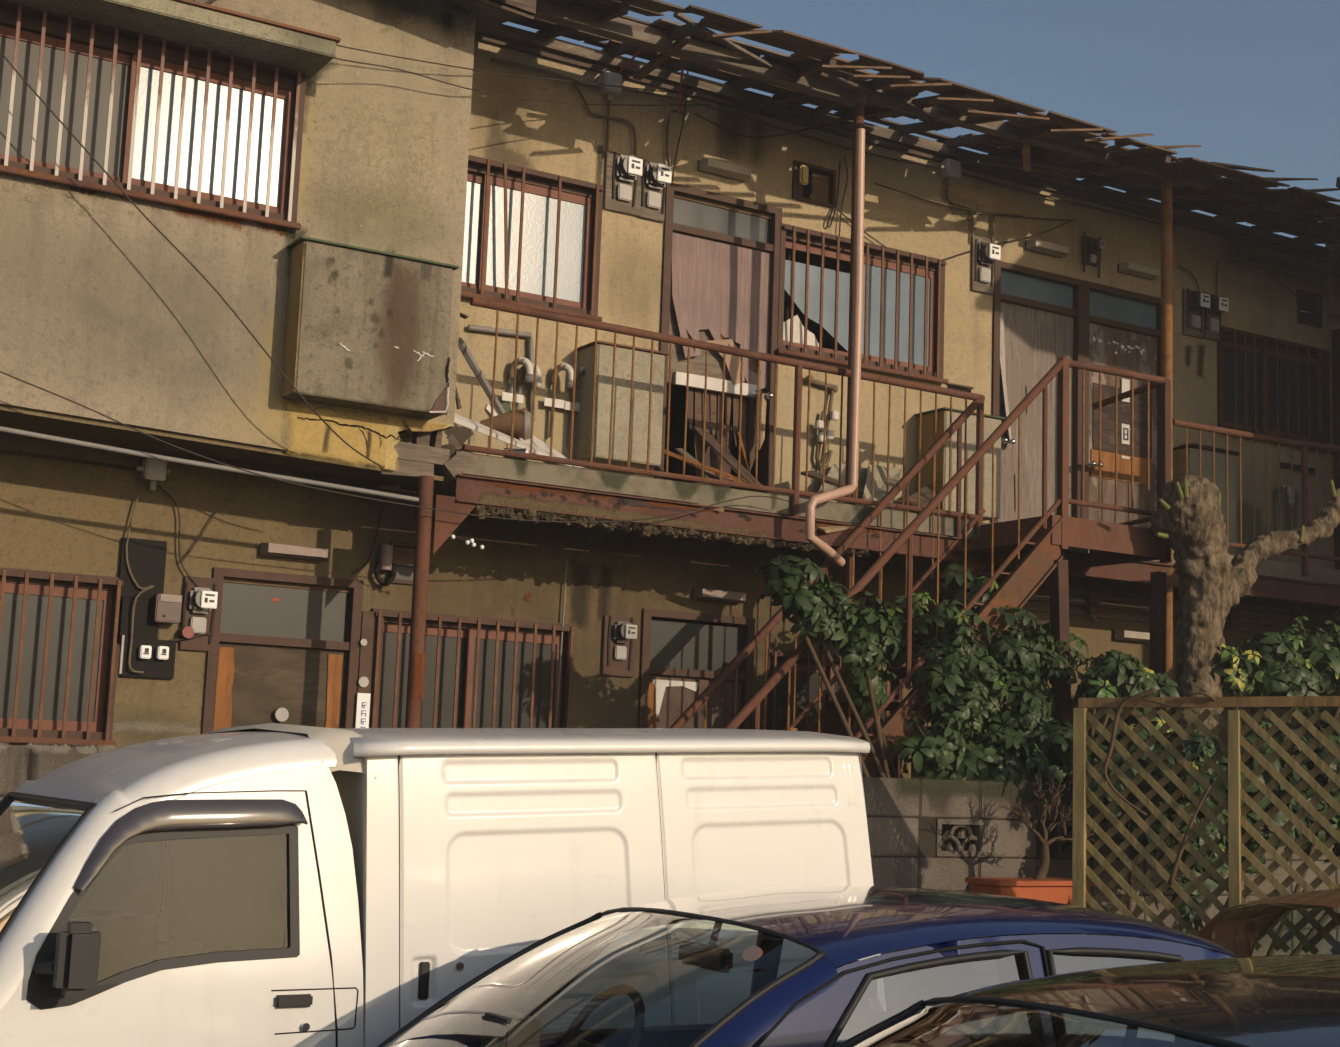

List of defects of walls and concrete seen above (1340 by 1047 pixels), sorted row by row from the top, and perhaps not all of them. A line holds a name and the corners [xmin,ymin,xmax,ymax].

rust [70,186,105,196]
rust [176,207,243,228]
rust [260,223,287,234]
rust [483,480,626,508]
spalling [472,505,871,557]
rust [800,523,885,538]